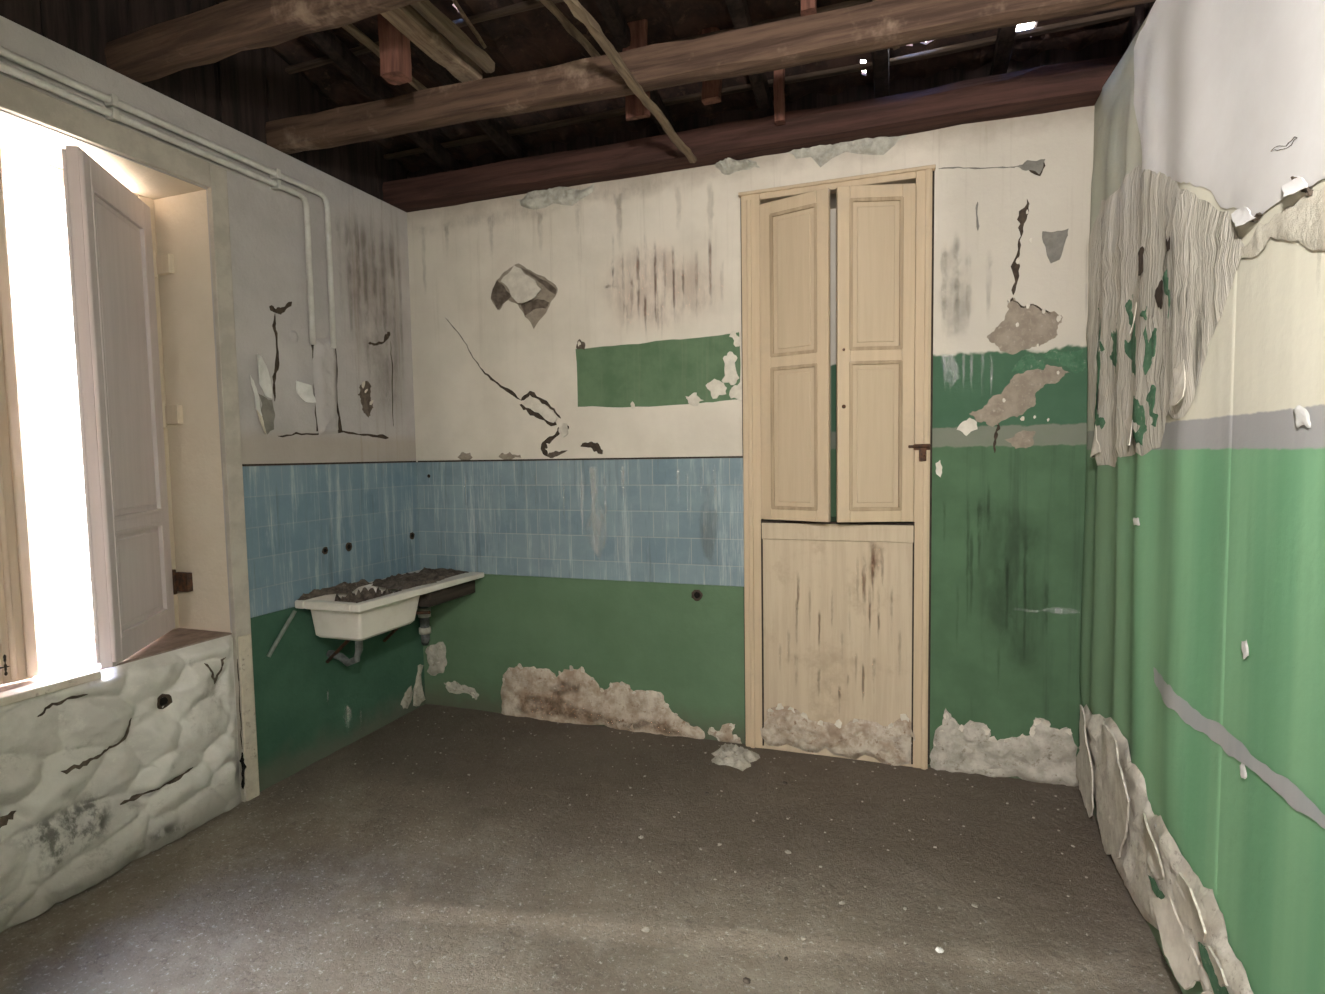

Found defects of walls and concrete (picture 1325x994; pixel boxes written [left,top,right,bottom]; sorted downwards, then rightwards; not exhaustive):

peeling [1134,0,1325,258]
crack [939,159,1045,295]
spalling [491,263,558,329]
crack [448,321,603,458]
peeling [686,331,742,406]
peeling [957,297,1086,449]
crack [37,694,88,717]
crack [61,718,132,774]
crack [120,767,193,805]
crack [204,657,247,789]
peeling [501,663,742,744]
peeling [930,704,1254,994]